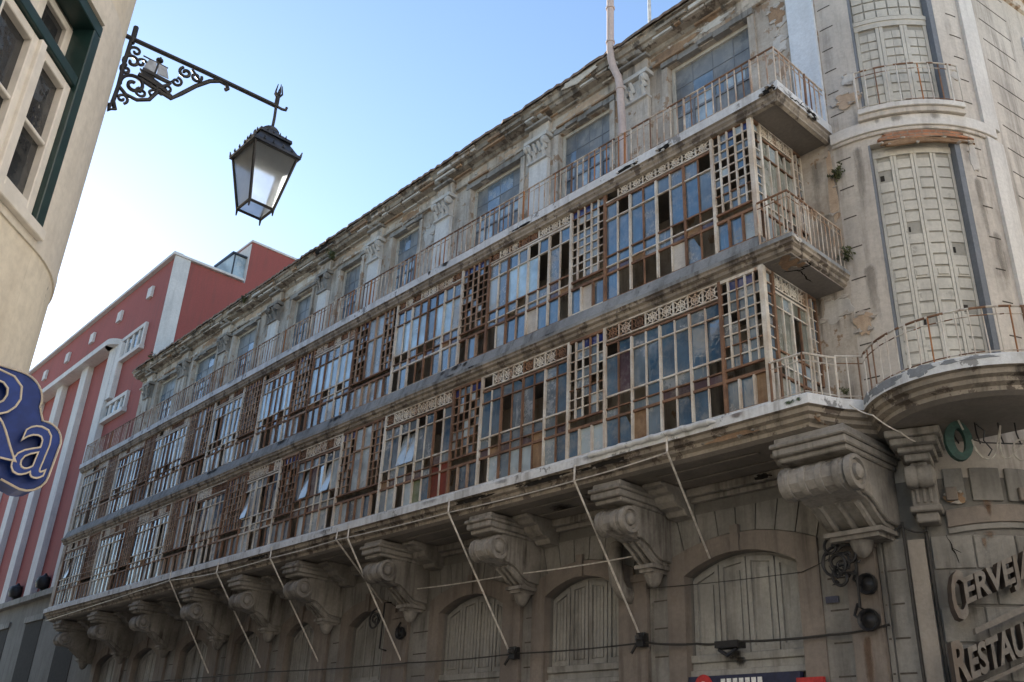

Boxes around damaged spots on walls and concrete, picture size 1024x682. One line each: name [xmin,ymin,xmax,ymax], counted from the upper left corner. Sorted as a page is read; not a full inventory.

spalling [766,1,789,57]
crack [785,261,811,282]
spalling [820,294,877,336]
peeling [863,355,999,405]